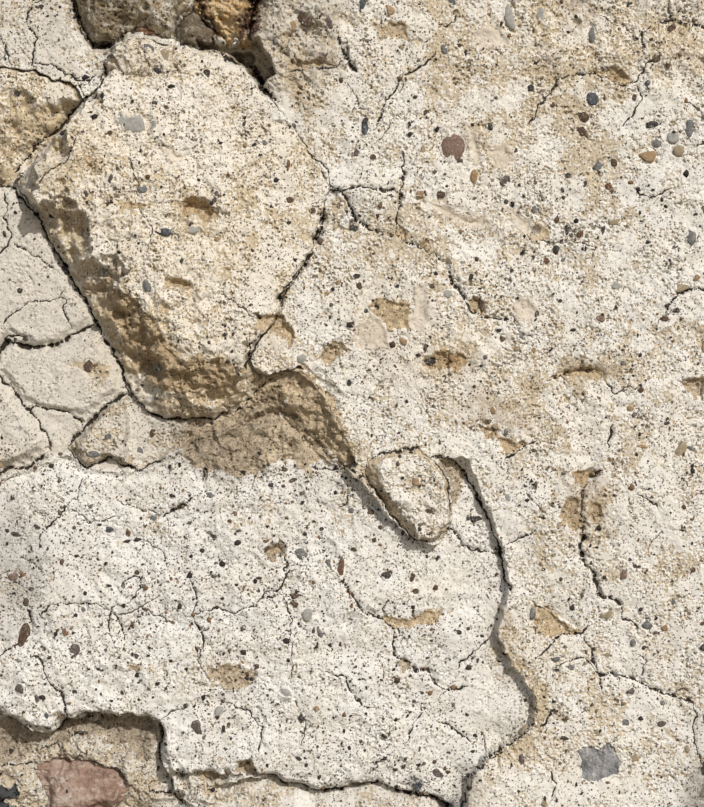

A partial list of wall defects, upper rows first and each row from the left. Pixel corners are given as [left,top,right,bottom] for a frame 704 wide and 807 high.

spalling [290,58,337,71]
crack [0,0,280,571]
crack [277,152,541,345]
crack [270,407,546,594]
crack [578,470,639,629]
spalling [0,712,163,765]
spalling [197,771,220,781]
crack [188,539,306,751]
peeling [292,790,315,807]
crack [267,701,555,807]
crack [342,577,490,691]
crack [534,620,703,764]